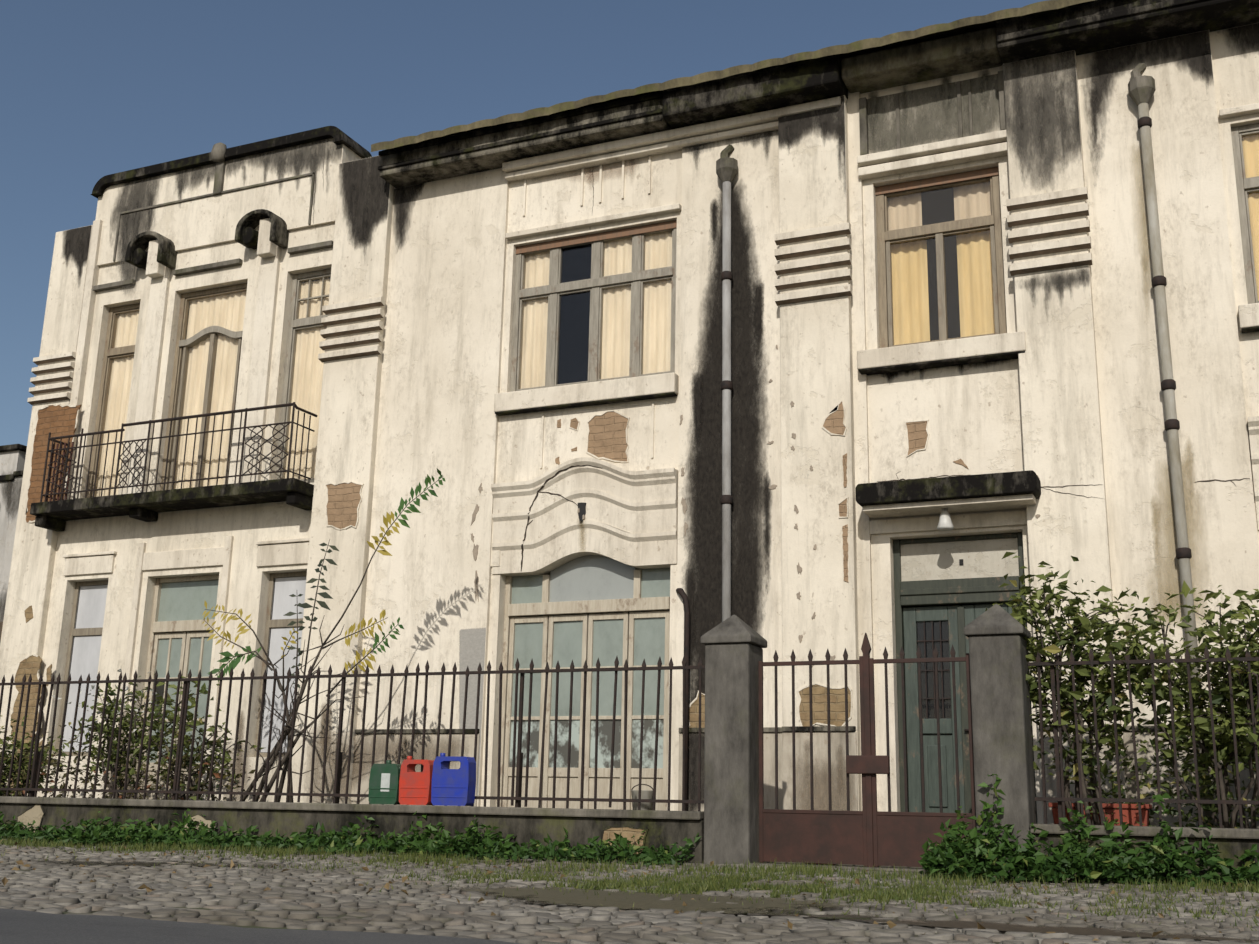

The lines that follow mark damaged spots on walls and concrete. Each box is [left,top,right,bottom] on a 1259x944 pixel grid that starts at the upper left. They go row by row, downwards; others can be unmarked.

damp [867,30,1213,180]
damp [63,225,92,277]
damp [110,176,159,286]
damp [176,138,423,246]
spalling [25,404,82,523]
spalling [325,481,364,530]
crack [521,465,600,571]
spalling [555,410,630,465]
damp [687,184,770,709]
spalling [905,420,930,457]
spalling [7,654,52,792]
spalling [797,683,853,726]